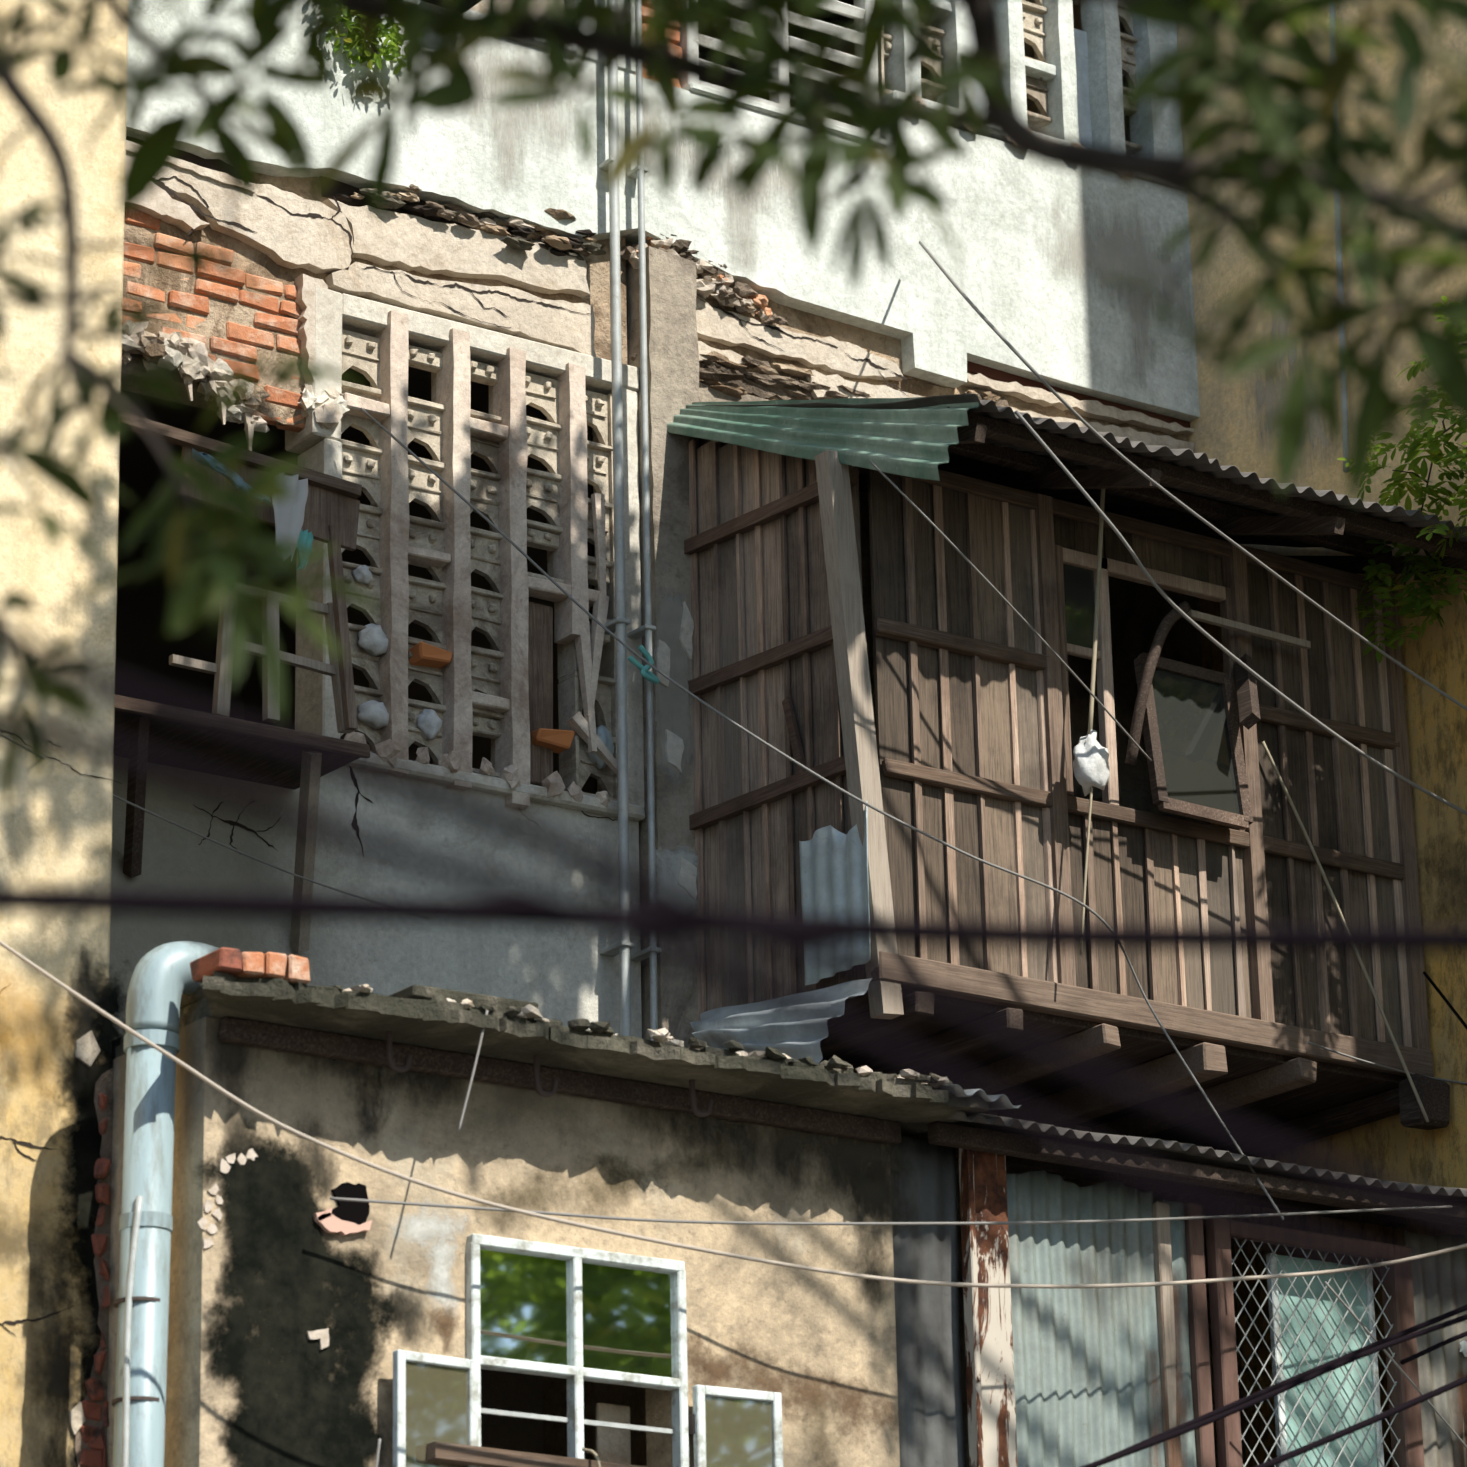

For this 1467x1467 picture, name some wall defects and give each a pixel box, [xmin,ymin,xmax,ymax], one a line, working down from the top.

flaking render [121,185,350,451]
crack [157,176,591,328]
crack [192,803,278,855]
crack [0,1136,52,1161]
crack [0,1306,73,1336]
spalling [69,1030,114,1467]
damp [198,1033,466,1467]
spalling [313,1182,372,1236]